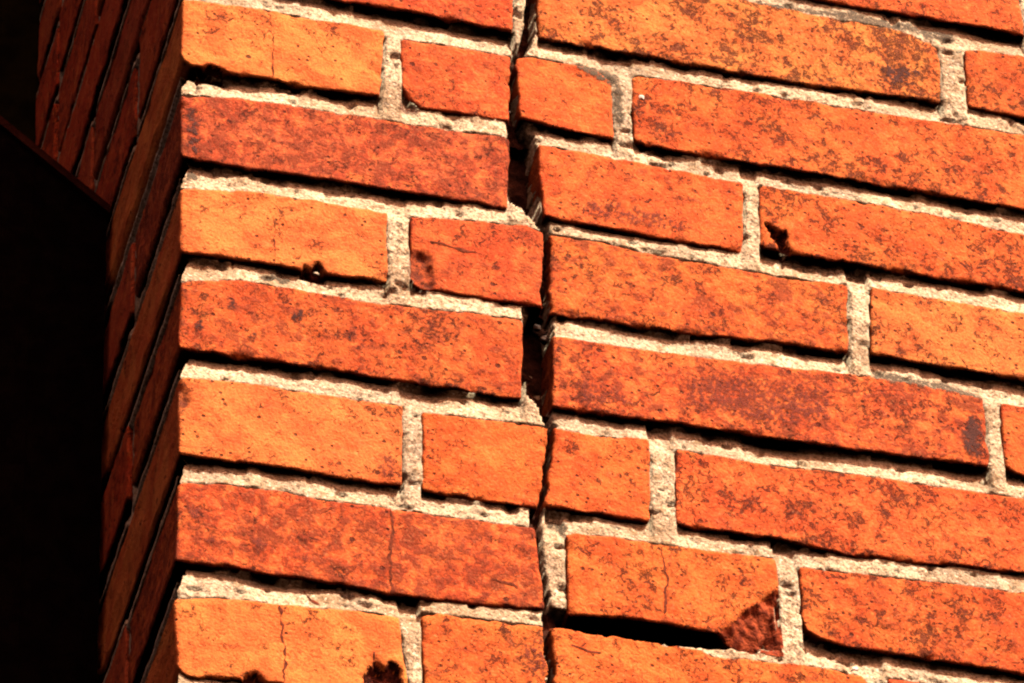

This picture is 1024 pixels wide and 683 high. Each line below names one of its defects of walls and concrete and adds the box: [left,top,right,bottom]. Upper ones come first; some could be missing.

crack [506,0,530,218]
crack [521,240,550,572]
crack [541,613,556,683]
spalling [720,590,784,657]